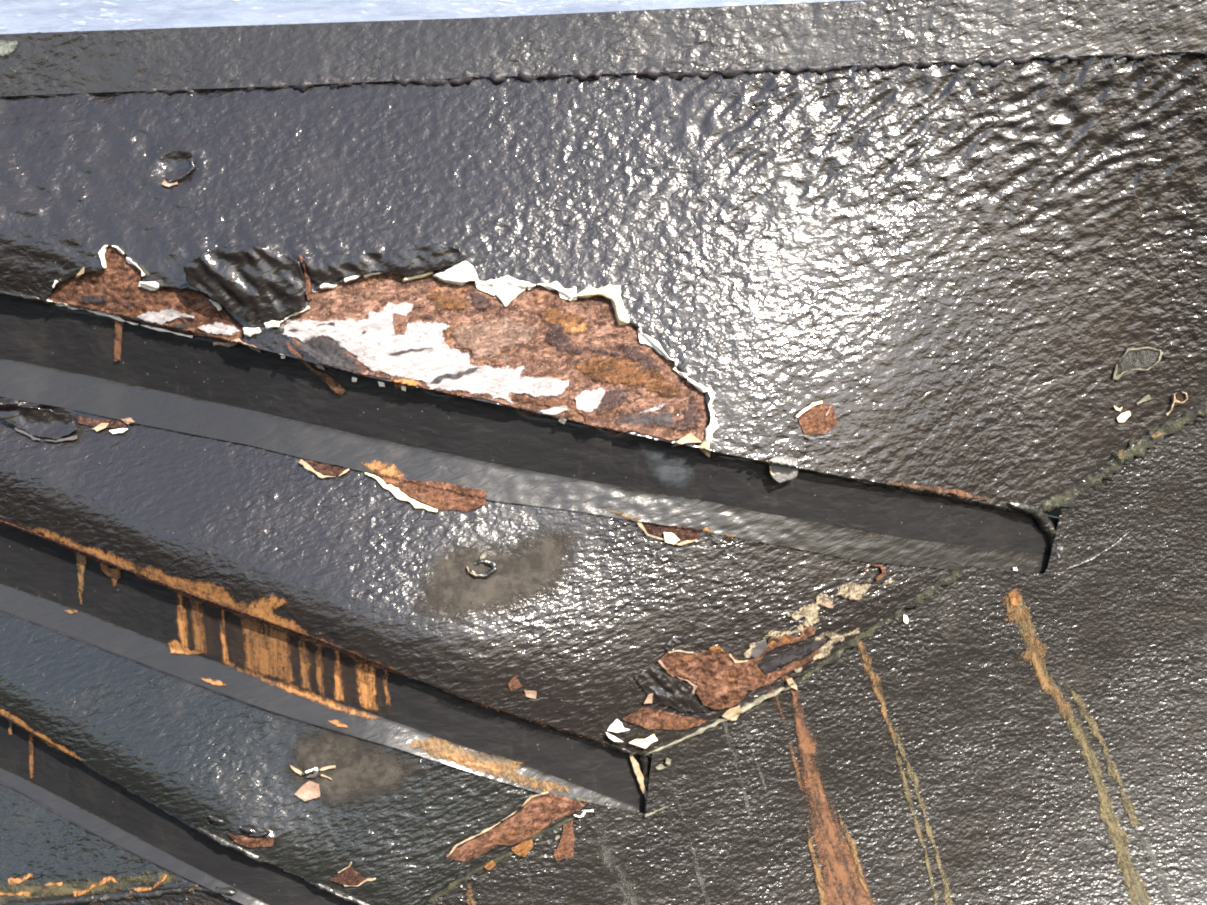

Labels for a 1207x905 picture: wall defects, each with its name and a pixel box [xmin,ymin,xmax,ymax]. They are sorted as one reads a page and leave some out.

corrosion [114,321,123,362]
corrosion [0,520,411,727]
water stain [290,732,414,801]
peeling [46,245,798,483]
peeling [365,461,487,512]
water stain [417,533,573,619]
peeling [445,791,594,871]
peeling [606,564,895,748]
peeling [796,401,837,440]
corrosion [769,675,875,905]
corrosion [858,640,953,905]
corrosion [1005,589,1154,905]